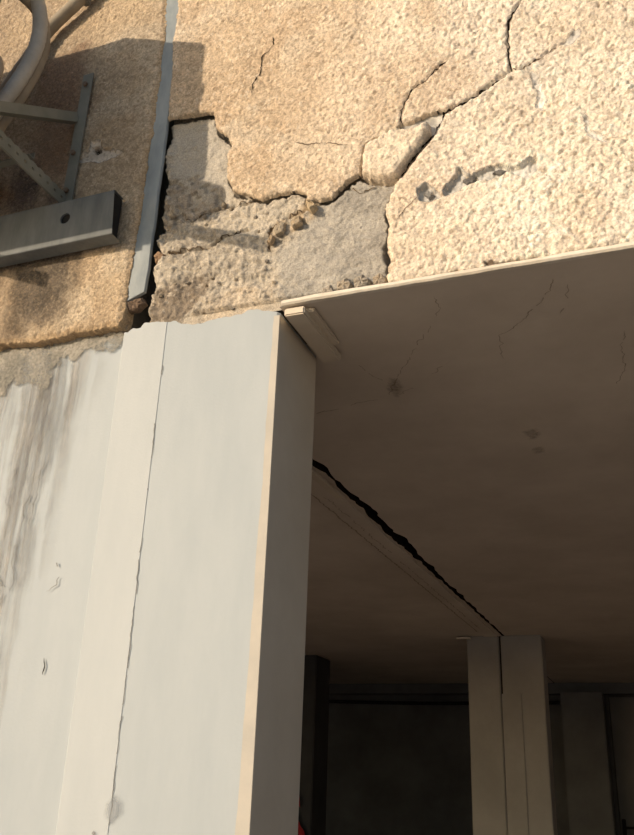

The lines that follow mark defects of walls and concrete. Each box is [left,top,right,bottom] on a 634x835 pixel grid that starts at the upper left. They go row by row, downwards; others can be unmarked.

crack [400,1,563,177]
spalling [127,115,395,325]
peeling [0,331,124,396]
crack [108,542,142,825]